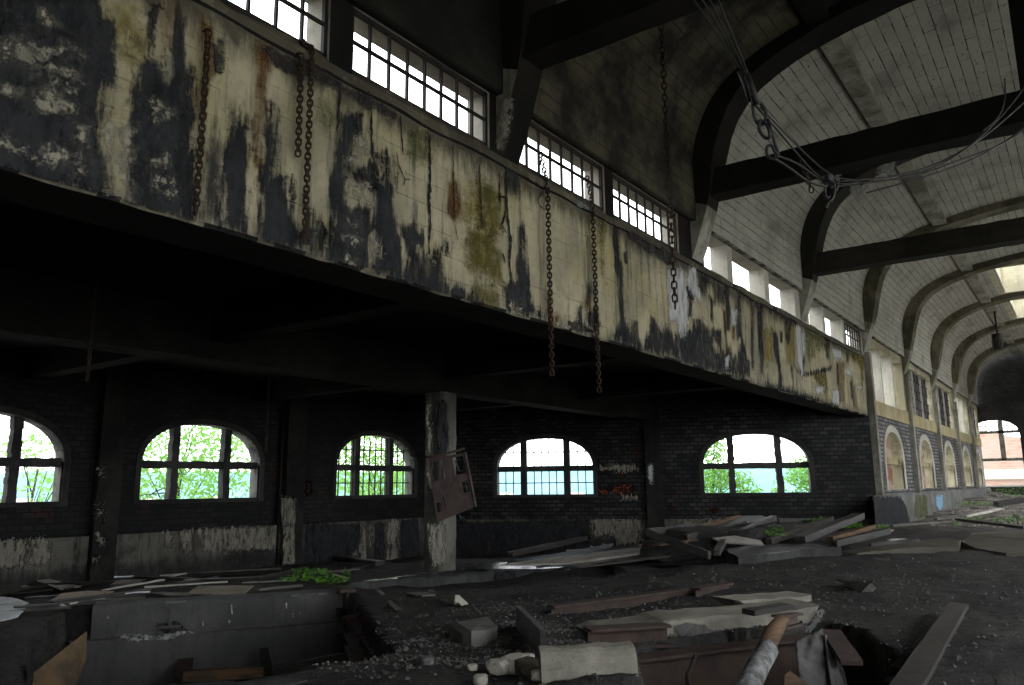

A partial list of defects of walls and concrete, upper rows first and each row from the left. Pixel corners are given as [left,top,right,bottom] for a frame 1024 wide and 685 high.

rust [253,46,269,167]
water stain [349,148,398,190]
rust [447,180,461,221]
water stain [667,267,737,366]
water stain [750,303,805,377]
water stain [816,348,862,411]
peeling [0,536,51,570]
peeling [164,497,296,565]
peeling [351,525,372,559]
peeling [386,518,400,560]
peeling [427,522,447,567]
peeling [591,518,644,546]